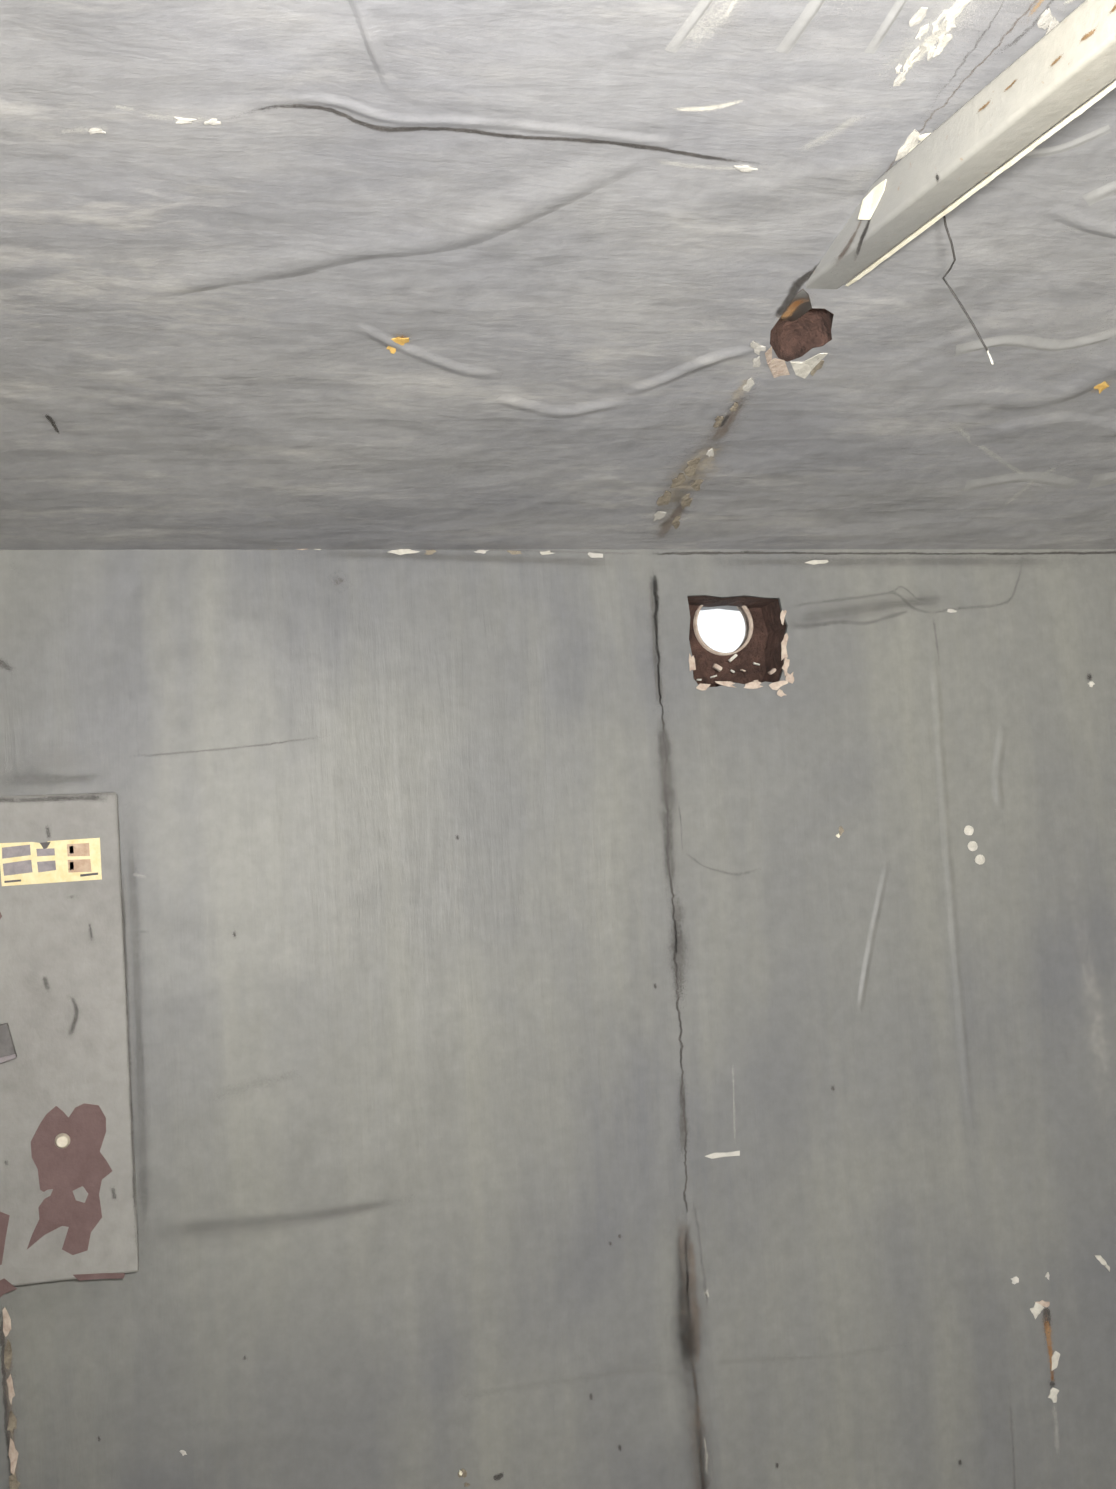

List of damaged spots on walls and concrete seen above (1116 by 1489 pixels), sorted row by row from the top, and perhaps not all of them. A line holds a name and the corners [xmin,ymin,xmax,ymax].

peeling [1037,0,1071,35]
crack [59,92,762,172]
crack [268,549,1116,1489]